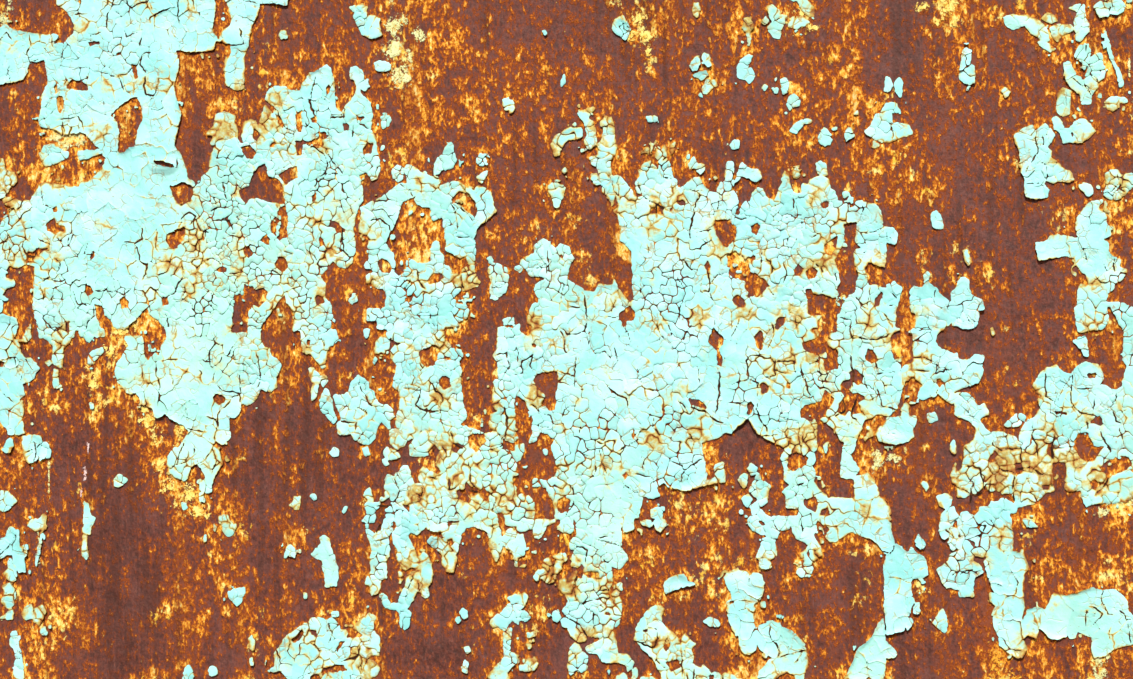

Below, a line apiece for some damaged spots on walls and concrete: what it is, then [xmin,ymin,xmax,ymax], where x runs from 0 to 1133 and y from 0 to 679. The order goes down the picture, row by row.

crack [140,52,159,96]
corrosion [382,1,426,89]
corrosion [626,11,654,73]
peeling [1003,0,1133,199]
crack [125,229,183,317]
peeling [0,0,383,503]
crack [561,295,618,377]
peeling [308,104,1133,679]
crack [732,355,776,395]
corrosion [138,406,212,520]
corrosion [871,450,901,474]
peeling [248,606,381,679]